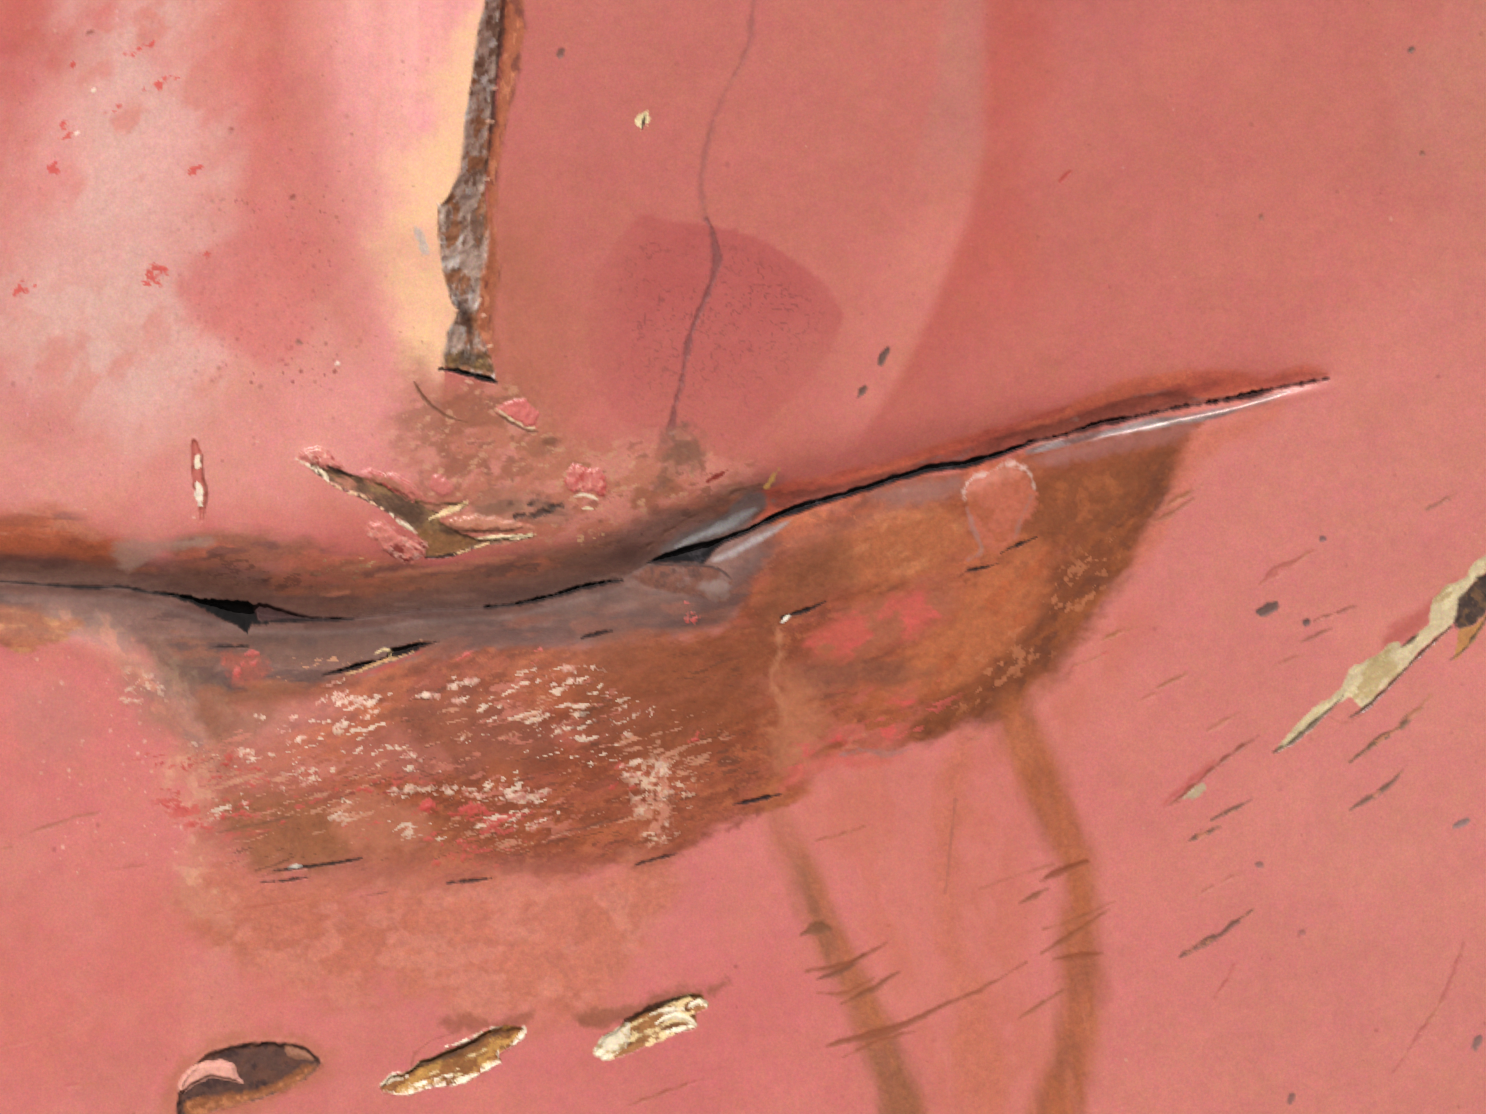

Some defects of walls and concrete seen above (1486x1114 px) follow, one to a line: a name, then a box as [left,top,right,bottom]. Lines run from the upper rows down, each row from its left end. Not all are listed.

corrosion [475,0,529,360]
crack [647,0,759,500]
corrosion [0,495,126,570]
peeling [293,445,540,565]
crack [0,376,1331,636]
corrosion [0,606,86,658]
corrosion [117,665,170,707]
corrosion [127,360,1331,1114]
peeling [1161,553,1486,810]
peeling [174,1040,324,1114]
peeling [378,1027,527,1097]
peeling [592,992,711,1063]